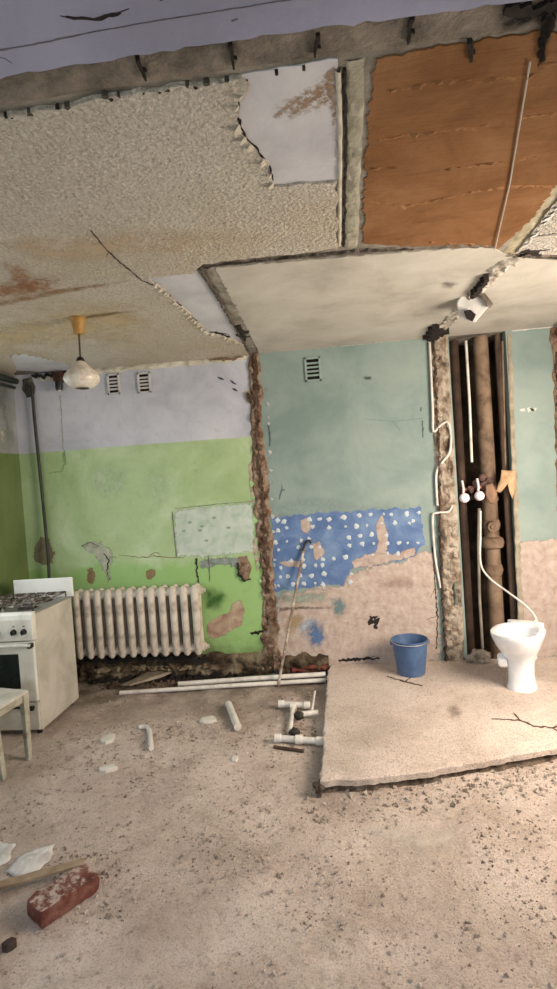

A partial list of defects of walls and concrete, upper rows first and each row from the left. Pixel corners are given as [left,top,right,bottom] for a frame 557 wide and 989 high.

crack [0,0,291,180]
spalling [185,77,210,90]
peeling [235,58,338,190]
crack [407,16,415,45]
crack [467,38,475,63]
damp [0,285,97,305]
crack [90,230,230,338]
peeling [94,269,250,374]
peeling [81,541,115,584]
flaking render [172,461,263,599]
flaking render [76,550,443,684]
crack [492,713,557,731]